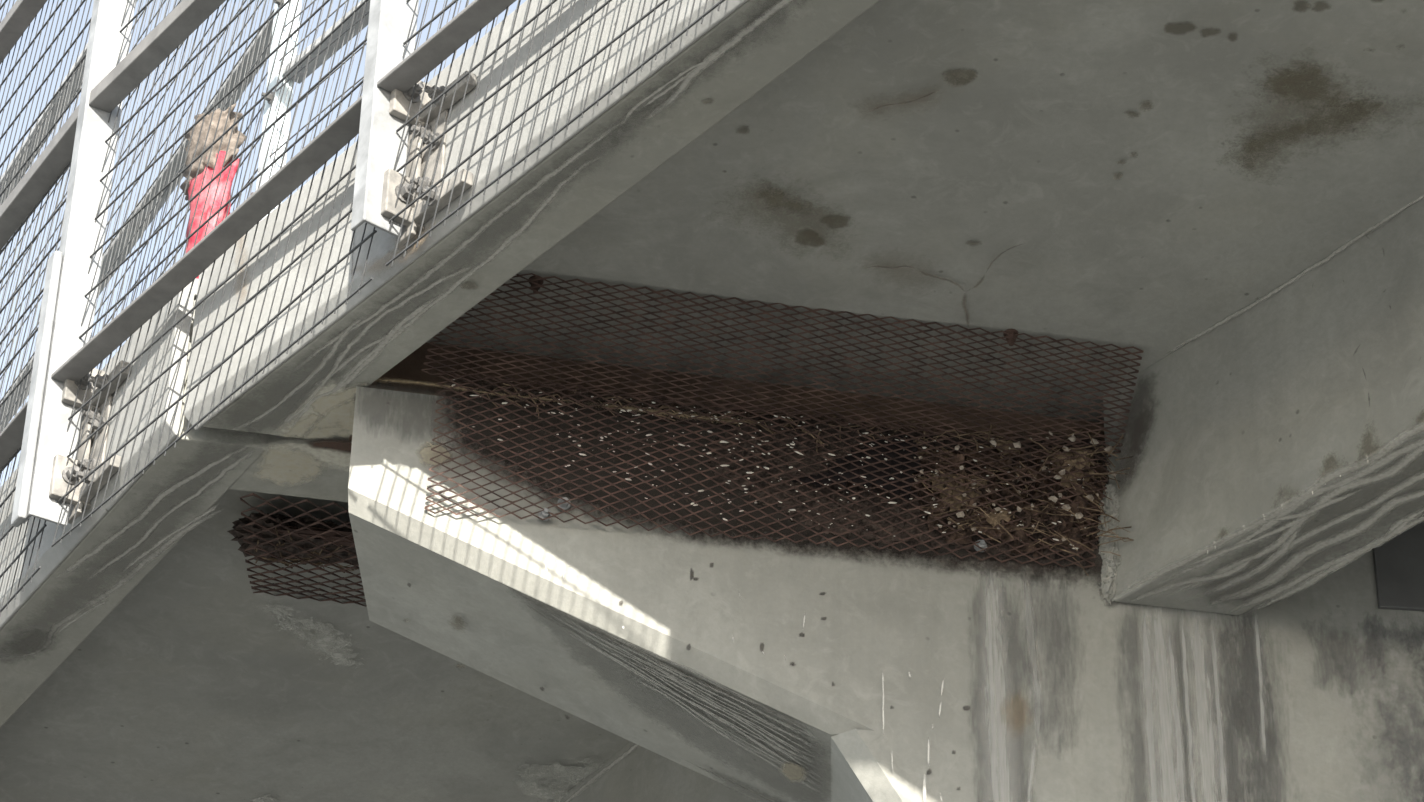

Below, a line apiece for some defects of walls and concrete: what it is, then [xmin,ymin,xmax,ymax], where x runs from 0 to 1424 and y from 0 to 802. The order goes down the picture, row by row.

leakage [624,0,792,122]
leakage [1165,24,1235,40]
leakage [761,191,847,246]
leakage [17,132,608,657]
leakage [1128,414,1424,753]
leakage [514,590,805,770]
leakage [985,572,1010,802]
leakage [1143,612,1226,802]